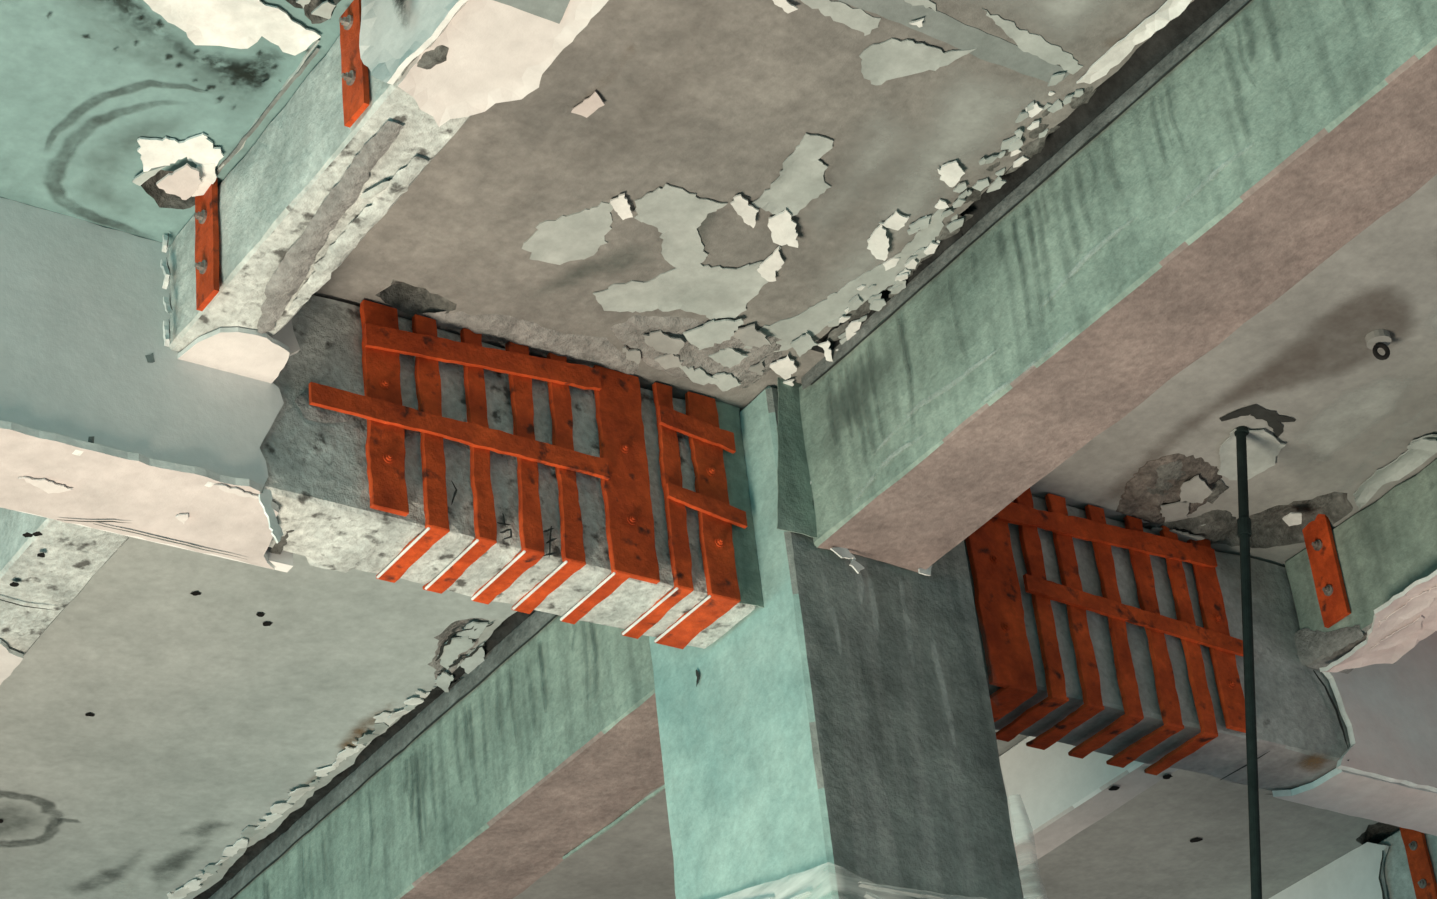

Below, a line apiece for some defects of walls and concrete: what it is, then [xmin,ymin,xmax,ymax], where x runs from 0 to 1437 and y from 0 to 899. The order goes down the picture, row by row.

damp [112,0,162,27]
peeling [144,0,341,56]
damp [195,52,277,101]
peeling [132,133,224,210]
spalling [257,121,429,334]
peeling [375,0,1192,391]
spalling [294,388,354,423]
spalling [1112,429,1437,549]
peeling [93,523,244,559]
peeling [167,618,493,899]
damp [0,792,61,847]
peeling [562,784,665,860]